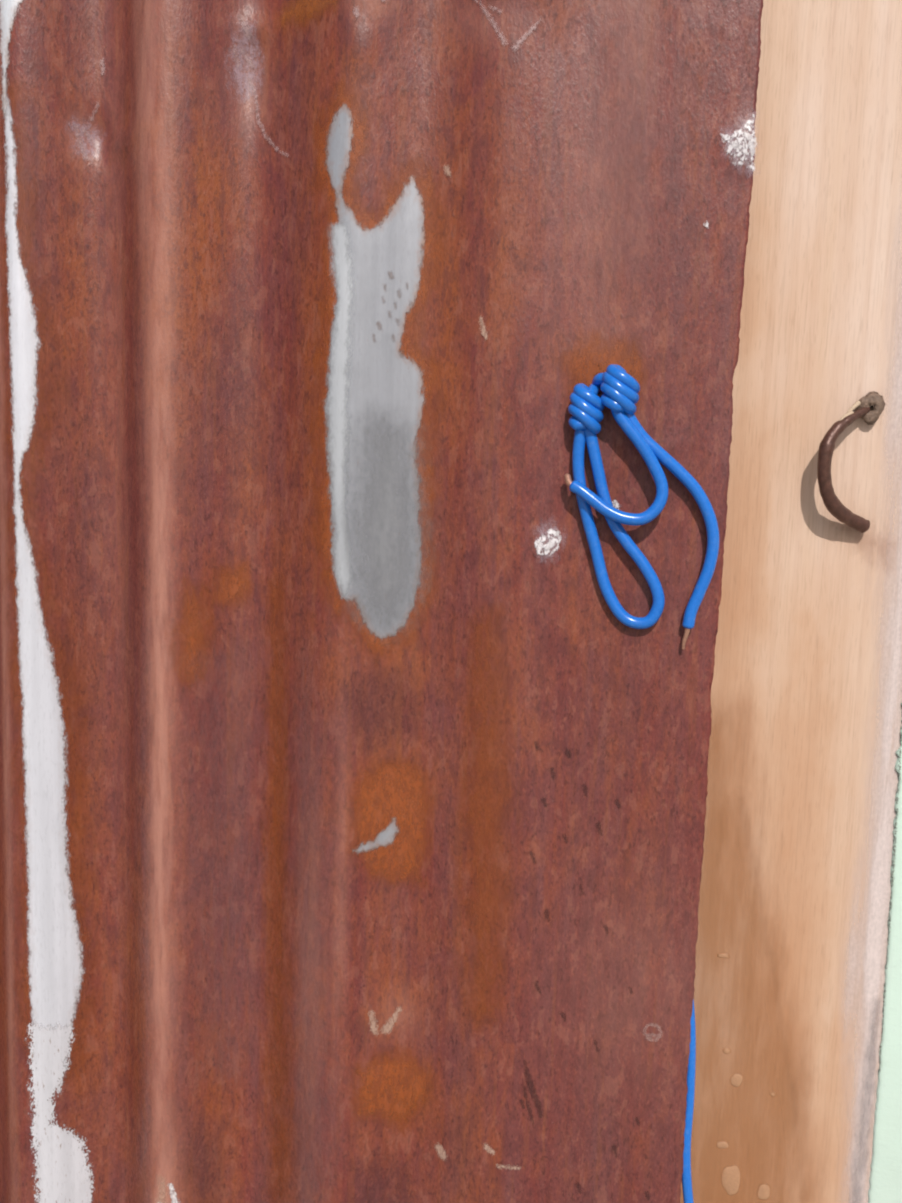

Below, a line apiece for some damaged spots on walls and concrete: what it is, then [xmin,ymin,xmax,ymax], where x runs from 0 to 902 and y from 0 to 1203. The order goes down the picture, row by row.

rust [3,159,30,279]
peeling [324,104,425,639]
rust [315,86,440,650]
rust [572,338,642,396]
peeling [0,0,95,1203]
rust [51,653,85,947]
rust [356,763,429,883]
rust [24,962,33,1040]
rust [67,993,81,1072]